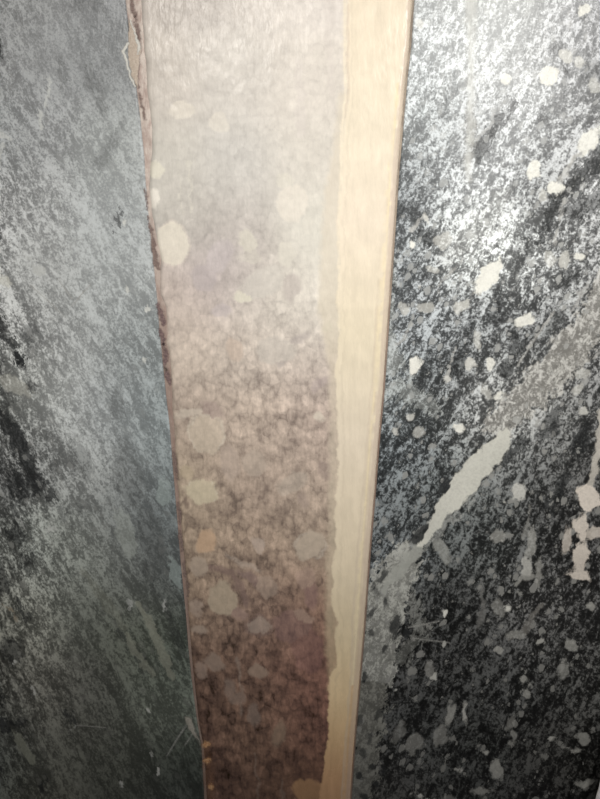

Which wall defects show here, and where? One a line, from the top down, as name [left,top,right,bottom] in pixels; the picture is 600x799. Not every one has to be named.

spalling [122,0,145,119]